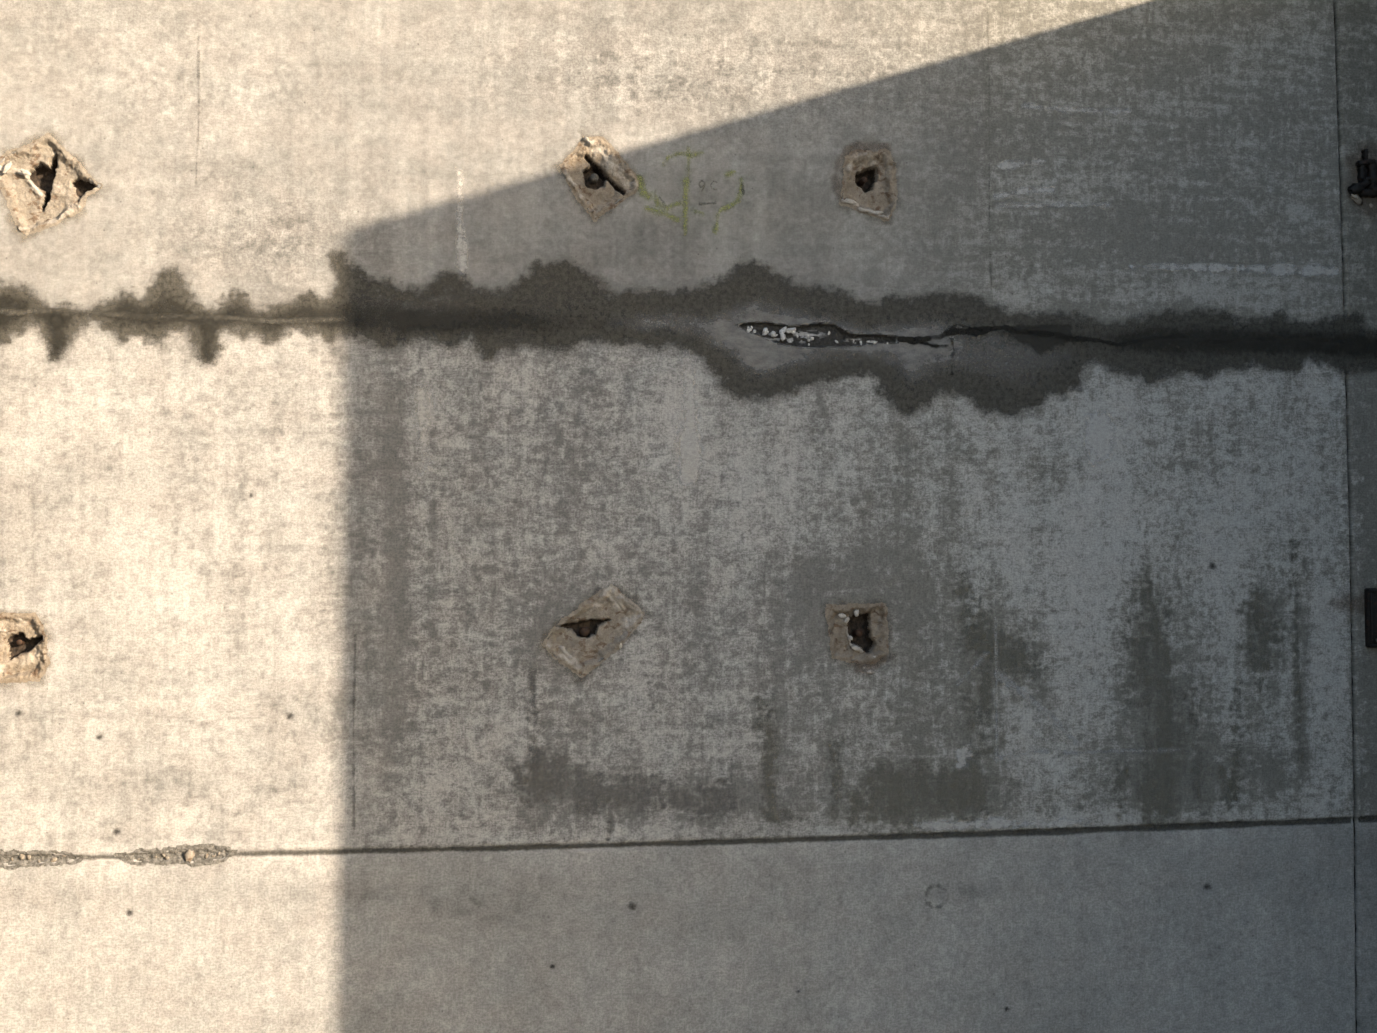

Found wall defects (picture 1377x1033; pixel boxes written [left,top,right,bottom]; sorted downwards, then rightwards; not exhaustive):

peeling [2,161,31,176]
leakage [997,160,1044,169]
leakage [0,171,1377,486]
crack [737,318,1261,375]
peeling [838,609,876,675]
leakage [831,744,1082,830]